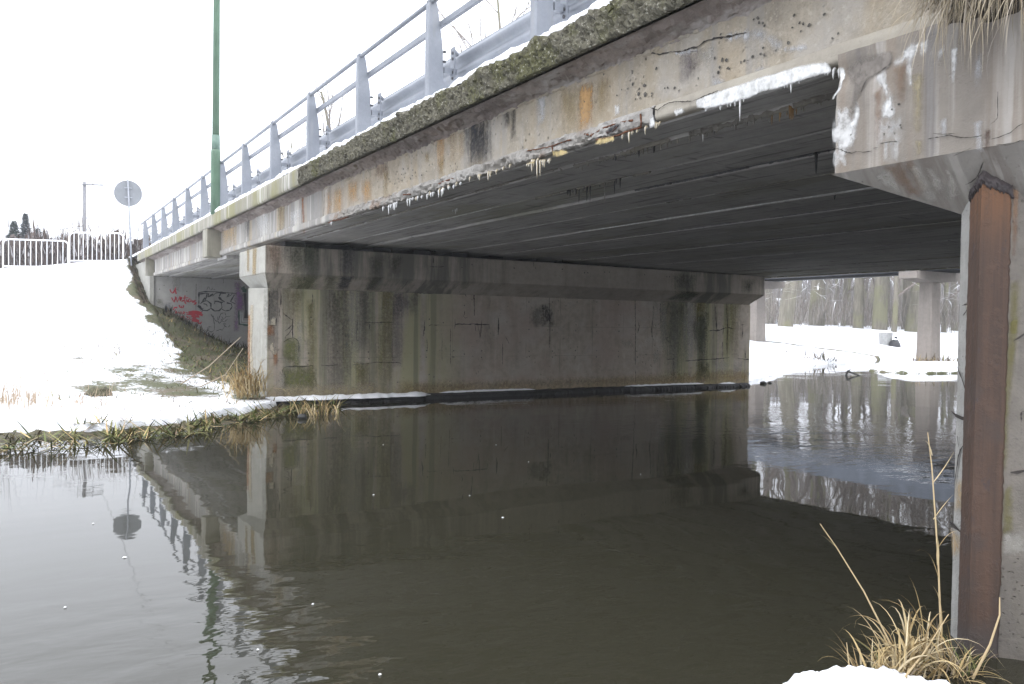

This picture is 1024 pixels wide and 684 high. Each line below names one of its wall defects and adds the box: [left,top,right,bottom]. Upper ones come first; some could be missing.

crack [651,32,745,55]
spalling [848,51,892,116]
water stain [877,72,893,117]
water stain [900,42,926,85]
spalling [328,73,656,223]
water stain [278,63,859,397]
water stain [268,290,277,333]